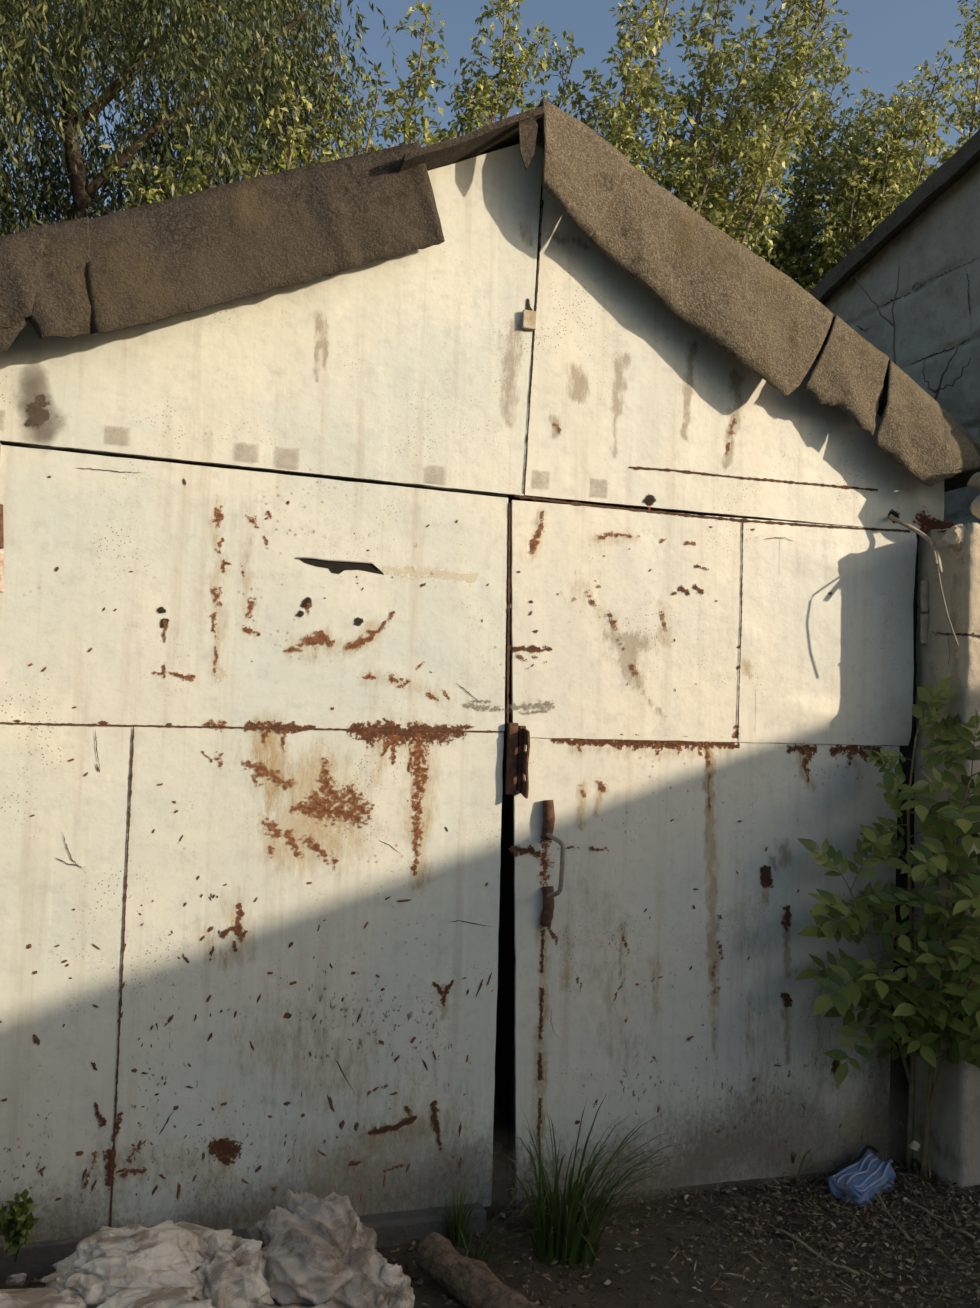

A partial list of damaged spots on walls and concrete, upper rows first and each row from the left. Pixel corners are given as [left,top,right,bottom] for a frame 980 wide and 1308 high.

corrosion [535,200,544,311]
crack [856,257,979,364]
corrosion [0,330,954,1227]